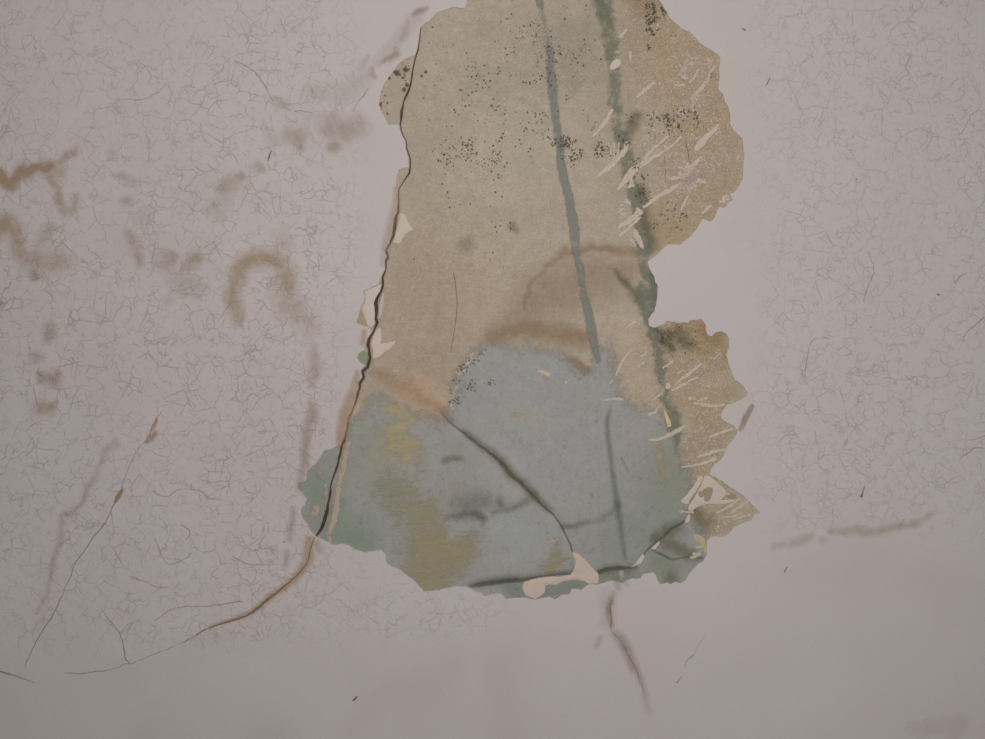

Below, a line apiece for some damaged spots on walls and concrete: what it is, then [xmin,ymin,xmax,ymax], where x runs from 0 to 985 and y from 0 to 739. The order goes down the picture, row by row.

damp [388,40,462,99]
damp [432,13,630,208]
damp [626,98,704,136]
damp [0,163,52,189]
damp [628,157,688,237]
peeling [298,0,759,599]
crack [469,437,573,552]
crack [0,488,123,674]
crack [478,578,526,586]
crack [598,566,628,574]